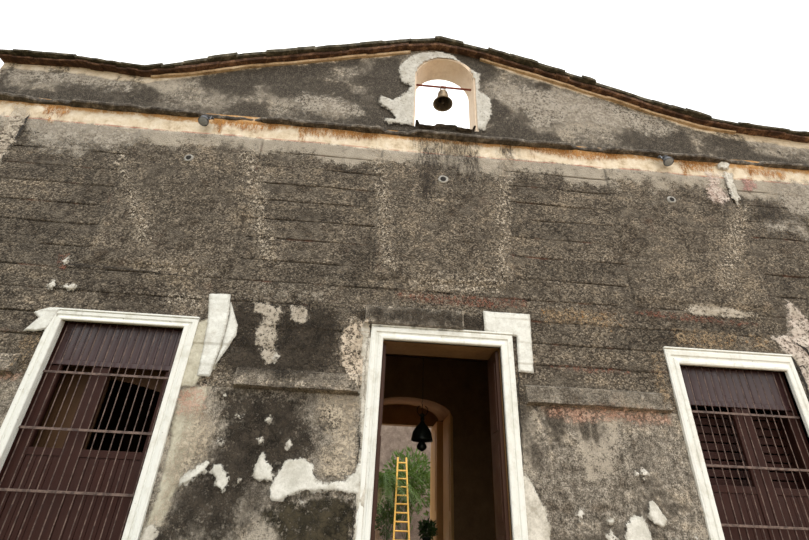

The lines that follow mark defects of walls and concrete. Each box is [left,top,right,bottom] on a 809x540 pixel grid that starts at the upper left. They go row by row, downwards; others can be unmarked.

corrosion [216,120,277,133]
corrosion [299,127,377,140]
peeling [379,96,395,111]
corrosion [532,147,617,160]
peeling [705,162,748,290]
spalling [254,301,308,364]
crack [791,343,809,402]
water stain [157,297,355,540]
peeling [150,387,226,527]